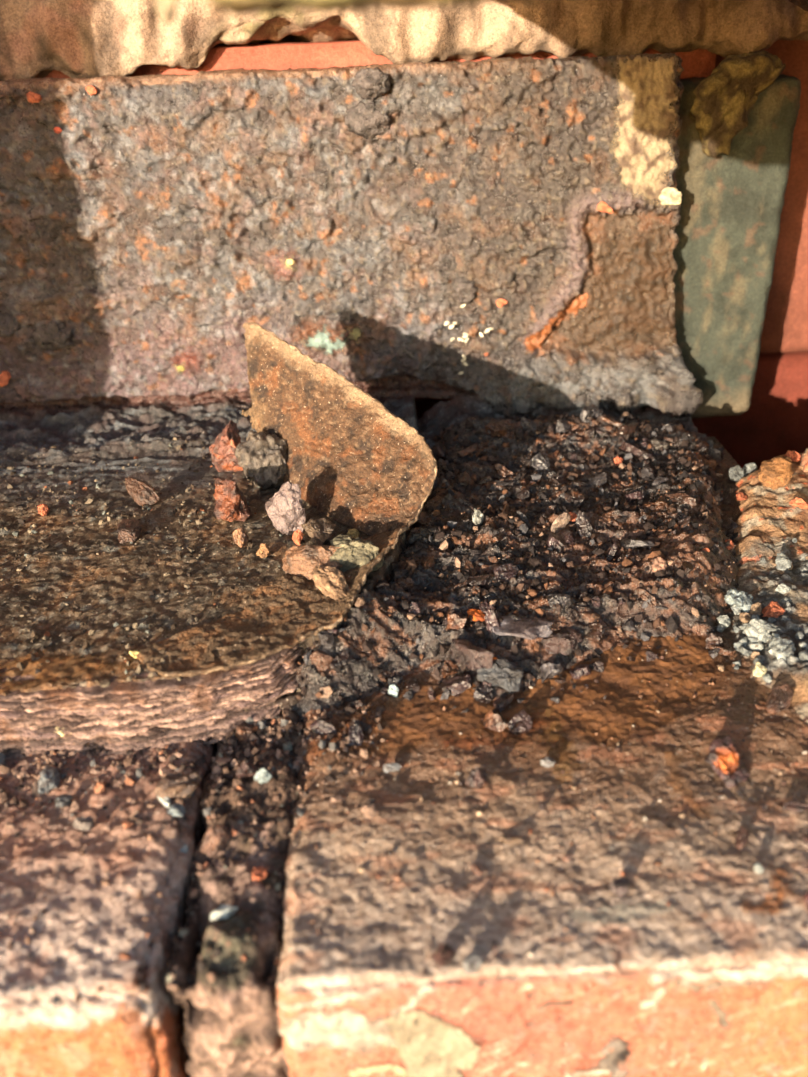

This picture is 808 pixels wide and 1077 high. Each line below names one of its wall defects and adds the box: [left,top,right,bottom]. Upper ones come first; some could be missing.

peeling [295,321,364,354]
rust [303,630,727,762]
crack [165,864,218,1047]